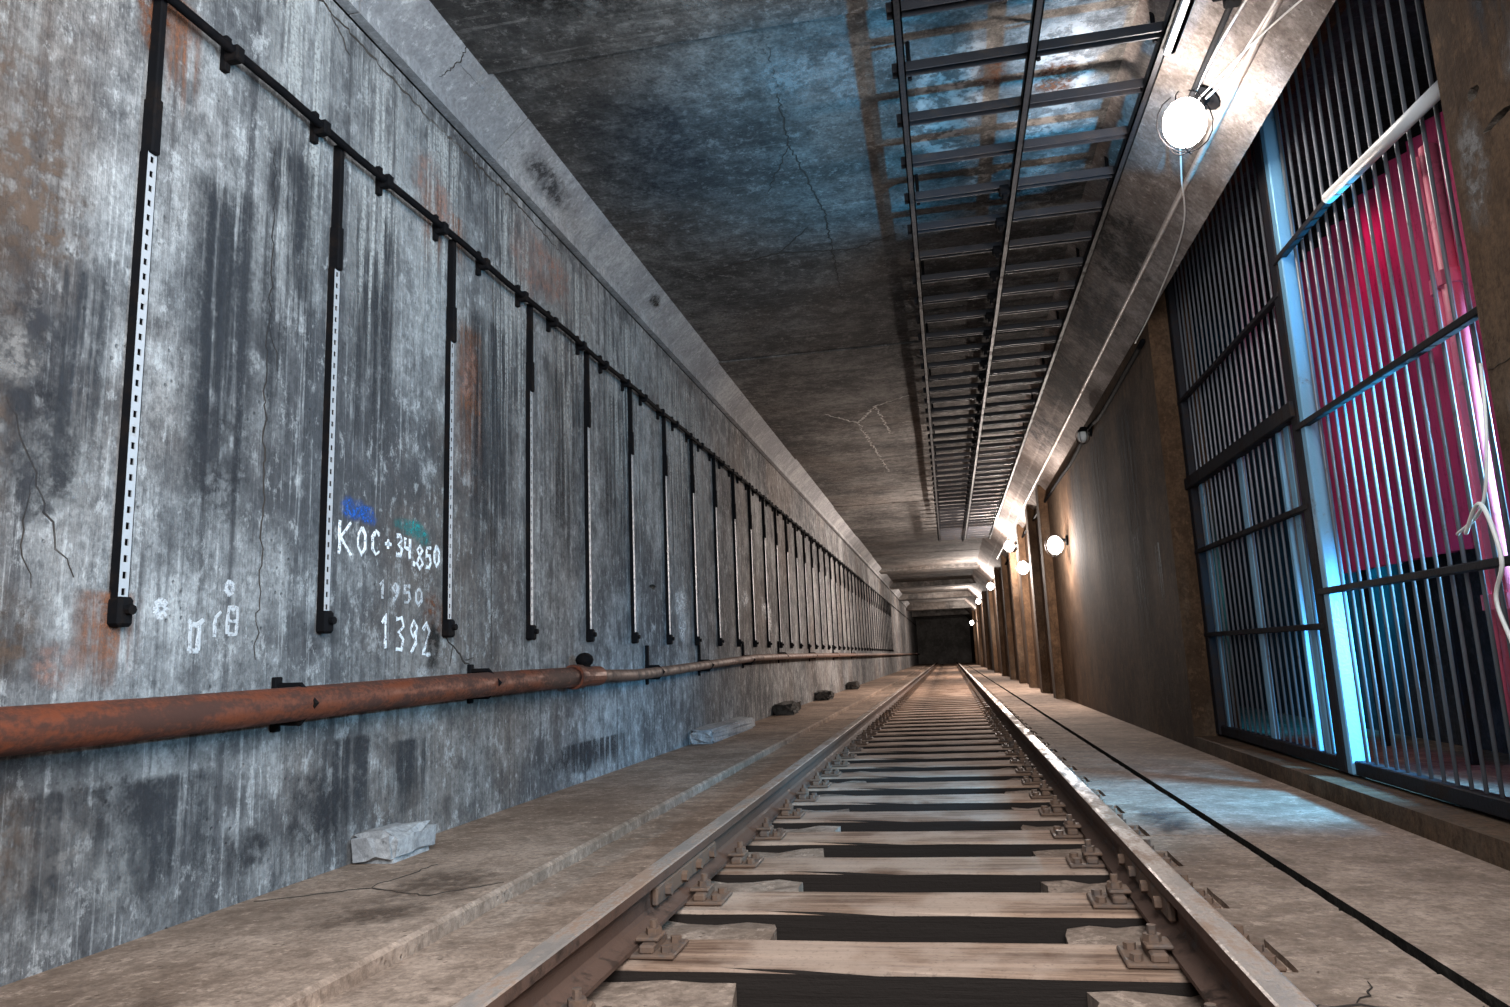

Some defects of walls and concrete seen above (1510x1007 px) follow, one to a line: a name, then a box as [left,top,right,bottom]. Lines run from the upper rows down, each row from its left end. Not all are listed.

damp [190,0,330,509]
damp [422,127,457,304]
rust [1036,62,1075,91]
peeling [1461,105,1510,160]
crack [6,395,74,588]